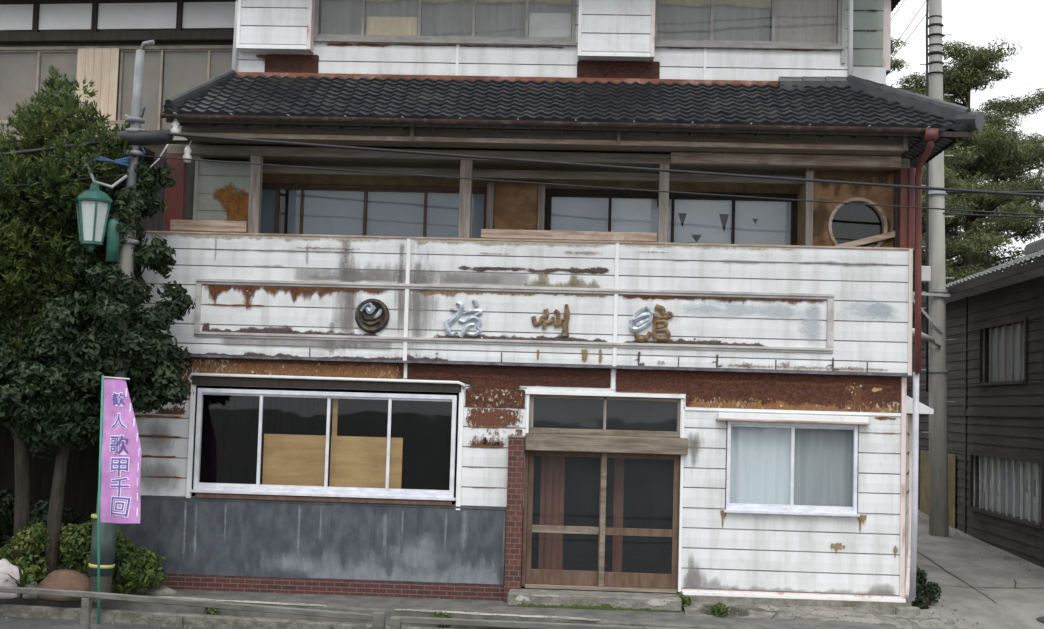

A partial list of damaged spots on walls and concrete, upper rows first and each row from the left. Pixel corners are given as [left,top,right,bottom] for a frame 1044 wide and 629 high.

corrosion [206,285,384,308]
corrosion [135,397,186,418]
corrosion [185,357,901,448]
crack [917,551,1017,603]